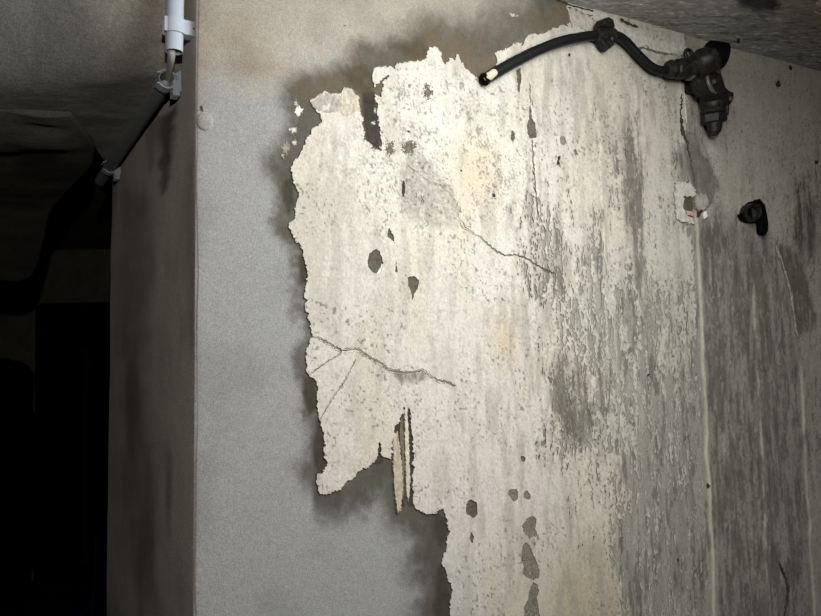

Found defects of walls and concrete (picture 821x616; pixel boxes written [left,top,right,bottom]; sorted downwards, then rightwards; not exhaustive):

crack [410,167,555,274]
flaking render [280,3,710,616]
crack [312,336,456,421]